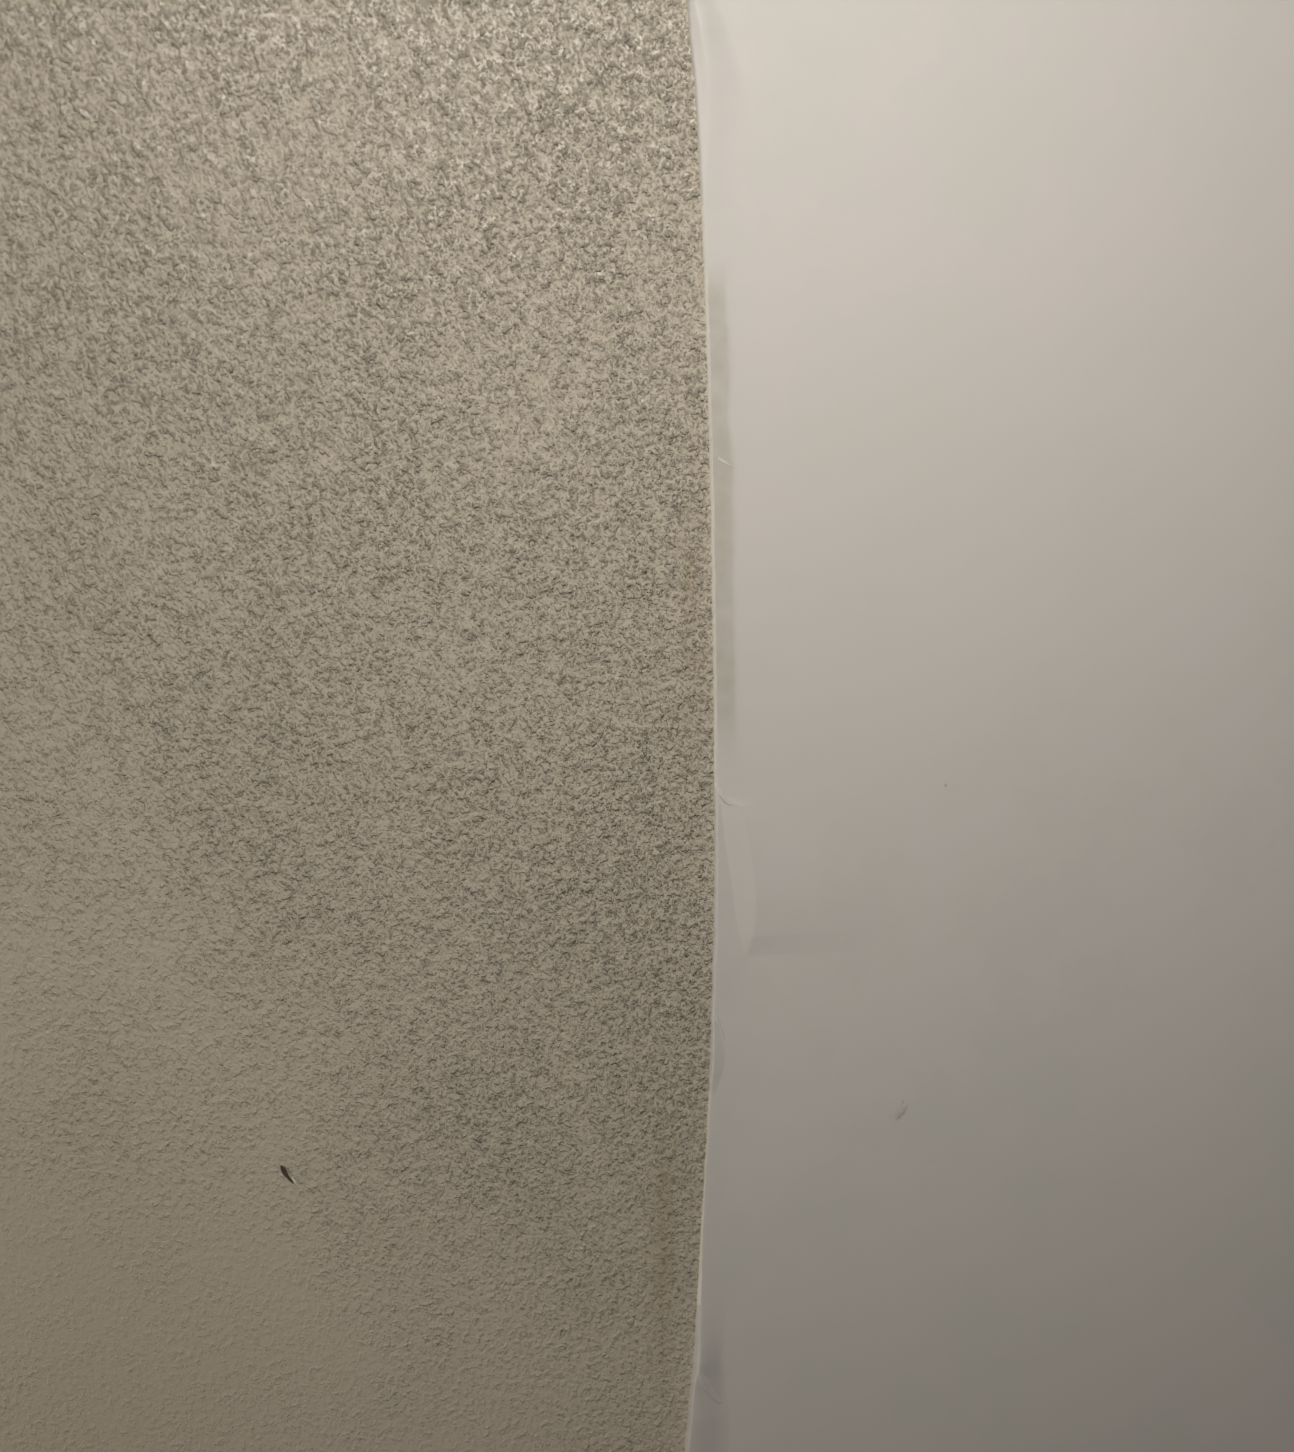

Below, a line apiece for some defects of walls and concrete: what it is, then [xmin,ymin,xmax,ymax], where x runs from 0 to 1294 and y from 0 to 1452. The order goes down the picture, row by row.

peeling [684,1304,738,1452]